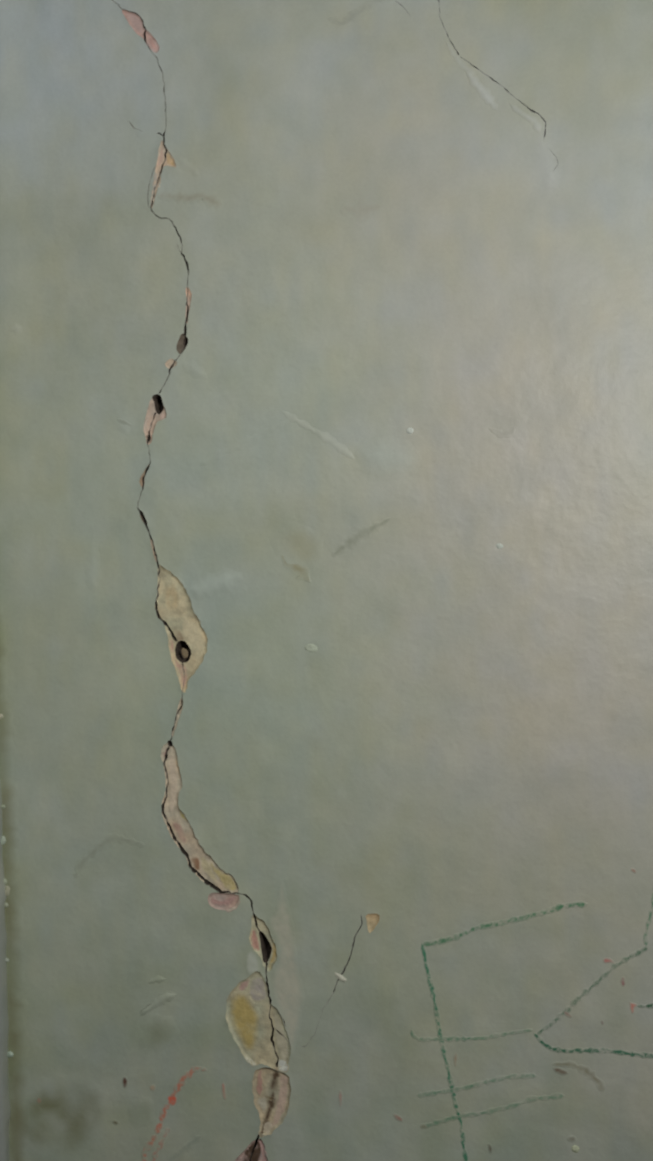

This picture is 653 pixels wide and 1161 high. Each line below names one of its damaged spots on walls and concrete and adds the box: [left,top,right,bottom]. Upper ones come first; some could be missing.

peeling [122,10,160,53]
crack [438,0,558,171]
crack [112,0,260,931]
flaking render [150,539,240,912]
peeling [226,878,305,1161]
crack [265,916,363,1068]
crack [249,1134,260,1161]